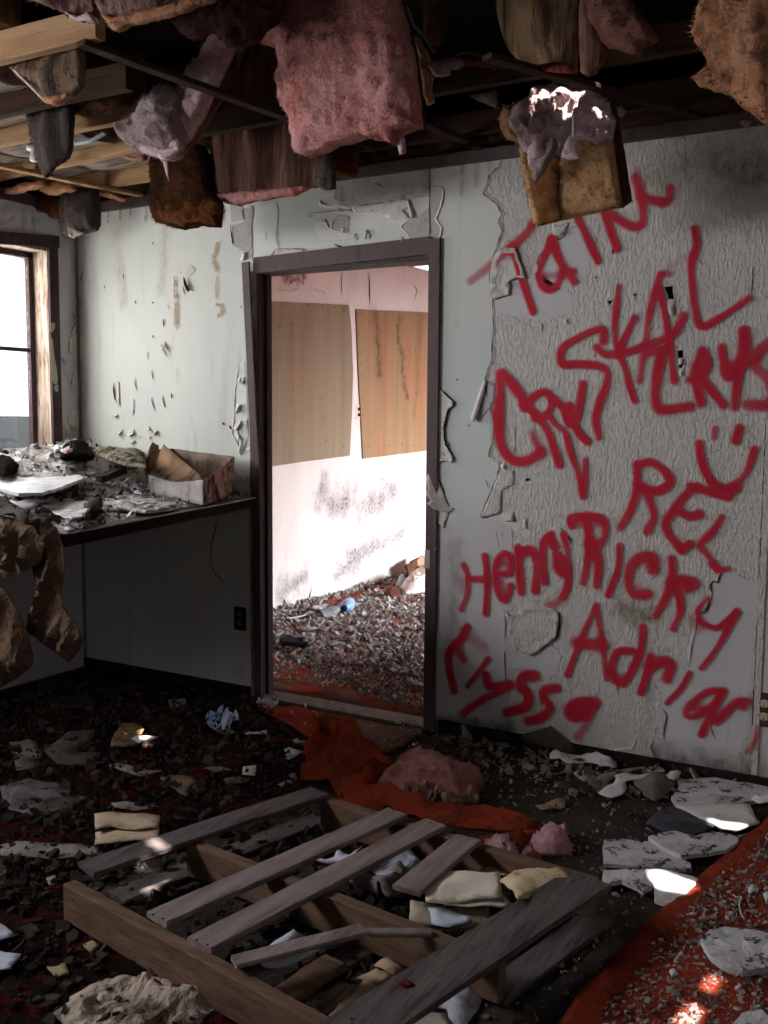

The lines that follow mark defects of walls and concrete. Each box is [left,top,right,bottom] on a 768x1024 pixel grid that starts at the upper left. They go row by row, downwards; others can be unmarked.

peeling [222,203,278,261]
peeling [314,169,444,241]
spalling [183,265,195,292]
peeling [470,159,525,423]
spalling [664,284,676,316]
spalling [676,349,686,376]
spalling [110,382,119,419]
peeling [117,426,157,444]
peeling [232,361,251,455]
peeling [438,387,455,465]
peeling [426,475,452,528]
peeling [480,429,530,554]